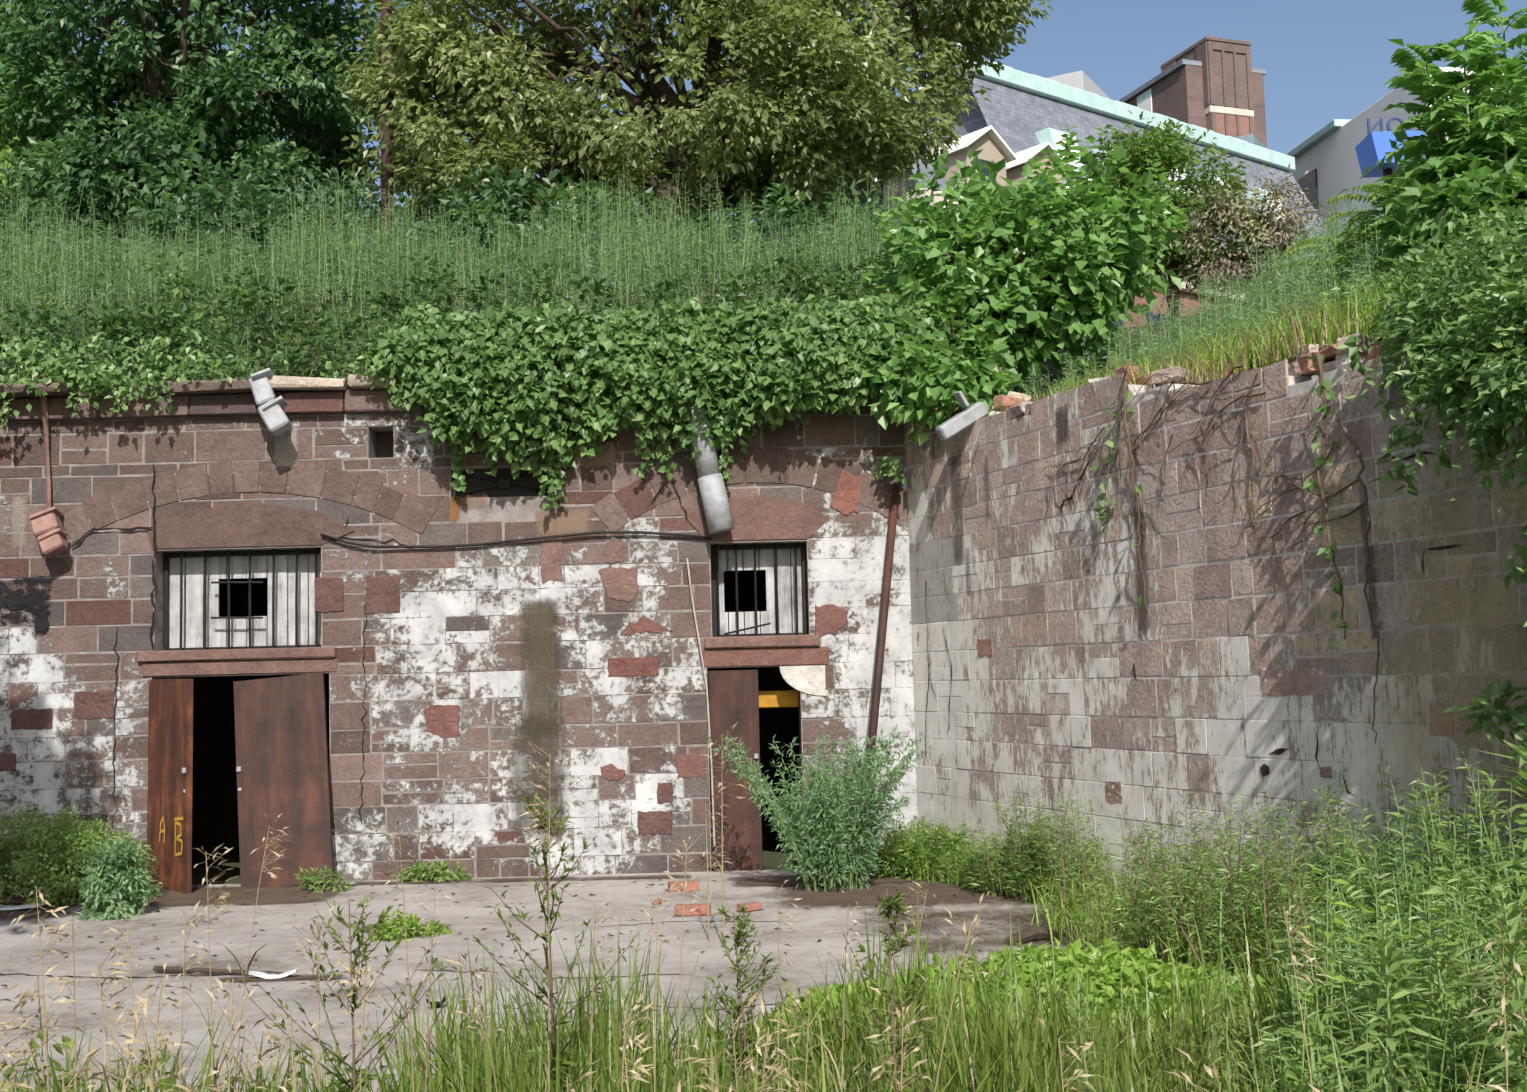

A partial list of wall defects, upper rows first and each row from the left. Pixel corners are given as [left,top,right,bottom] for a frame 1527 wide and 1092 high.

damp [0,575,53,635]
peeling [0,606,149,890]
peeling [76,547,128,599]
peeling [287,413,707,881]
damp [514,599,564,835]